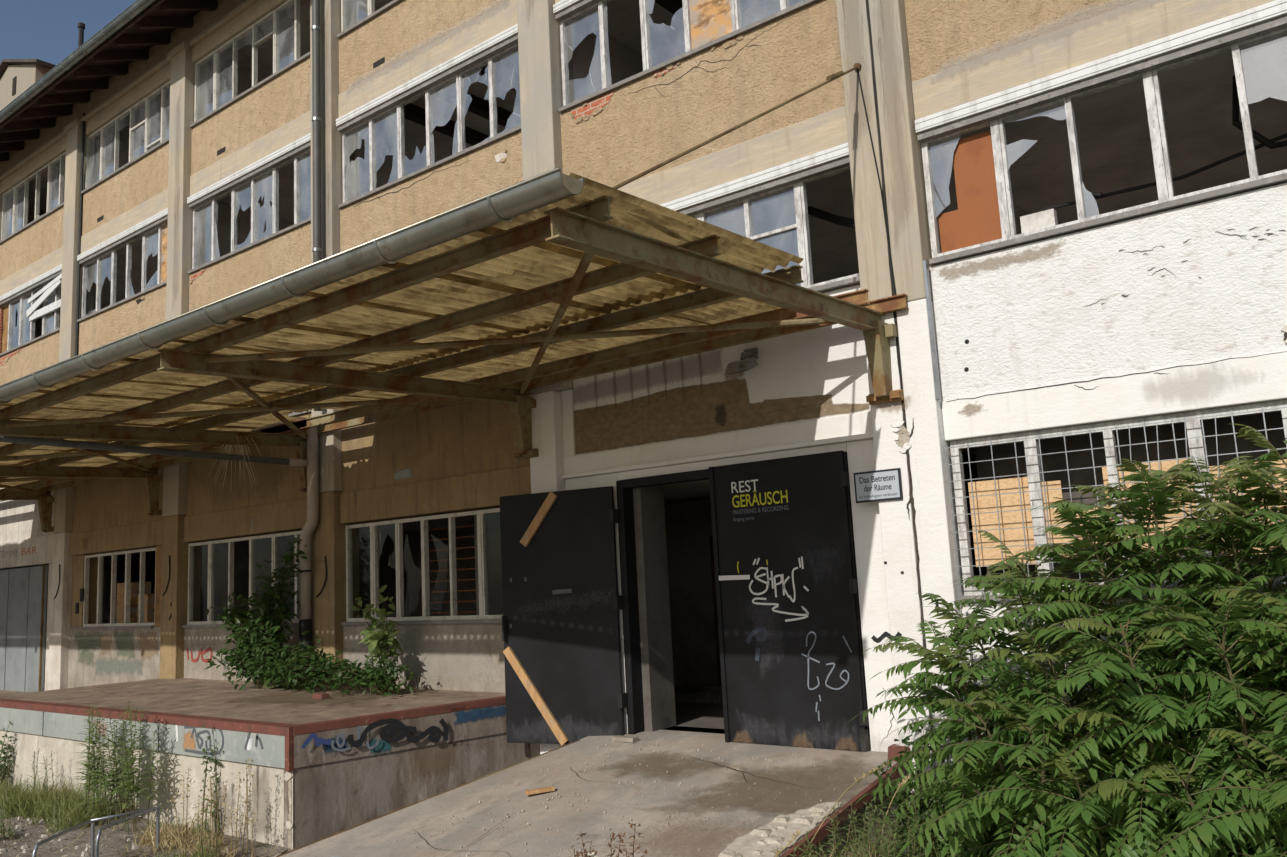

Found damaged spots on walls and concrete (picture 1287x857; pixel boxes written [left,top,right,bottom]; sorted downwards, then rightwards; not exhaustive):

flaking render [571,91,614,123]
peeling [574,379,869,454]